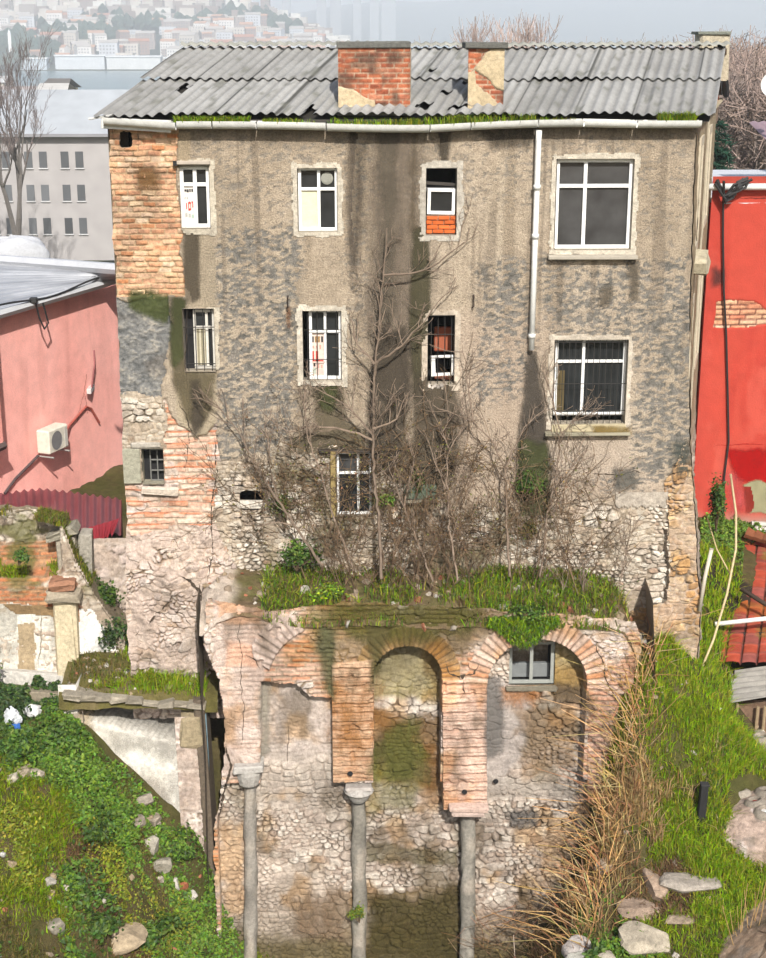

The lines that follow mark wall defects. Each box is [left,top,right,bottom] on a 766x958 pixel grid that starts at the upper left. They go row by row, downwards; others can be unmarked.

flaking render [713,300,766,328]